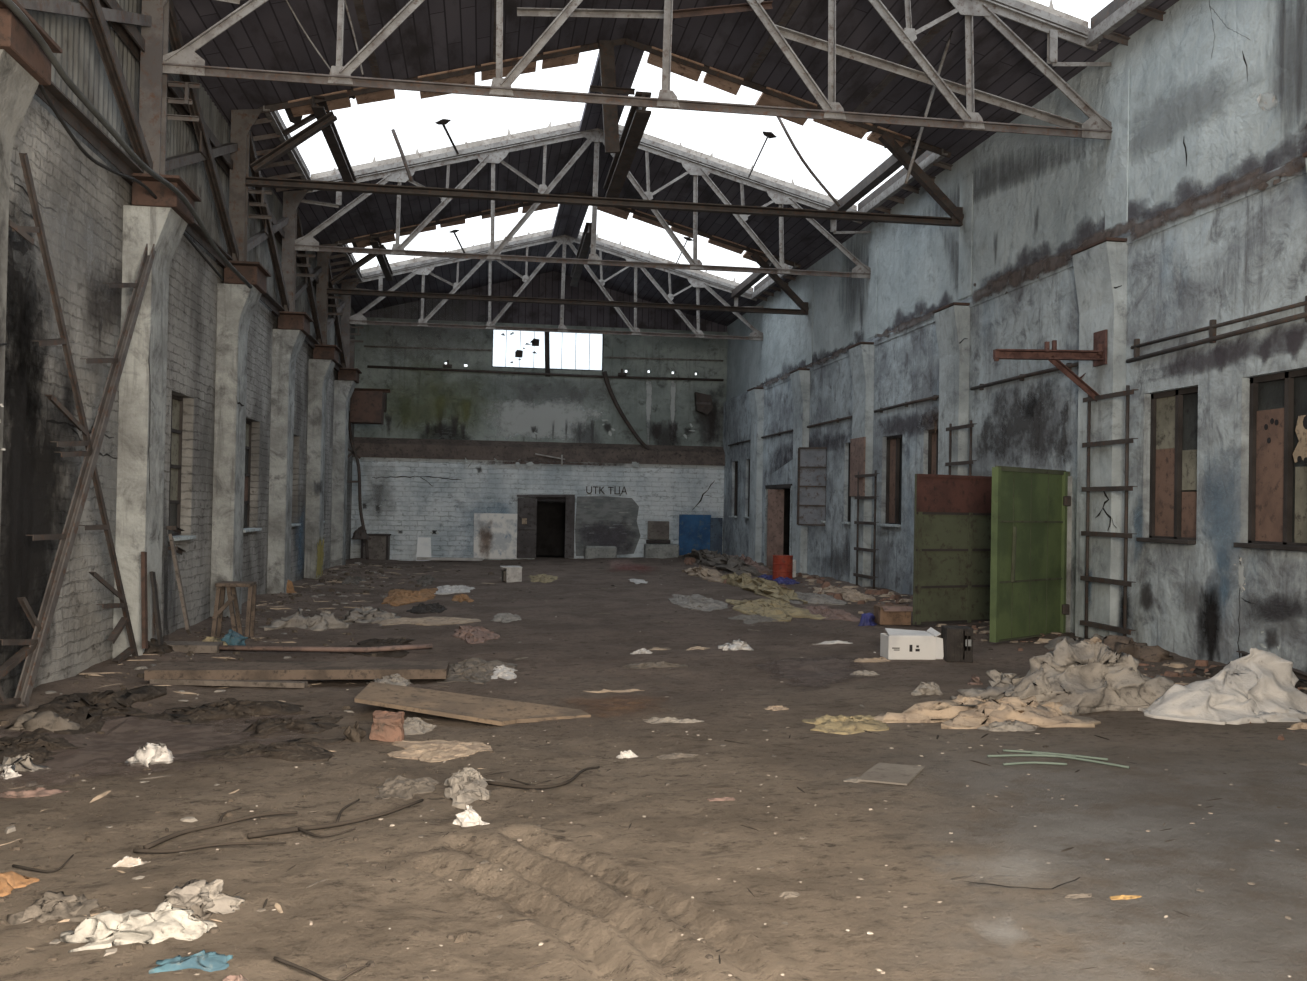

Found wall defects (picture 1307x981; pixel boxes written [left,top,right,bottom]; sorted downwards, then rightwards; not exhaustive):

leakage [954,153,1069,207]
crack [1096,491,1117,531]